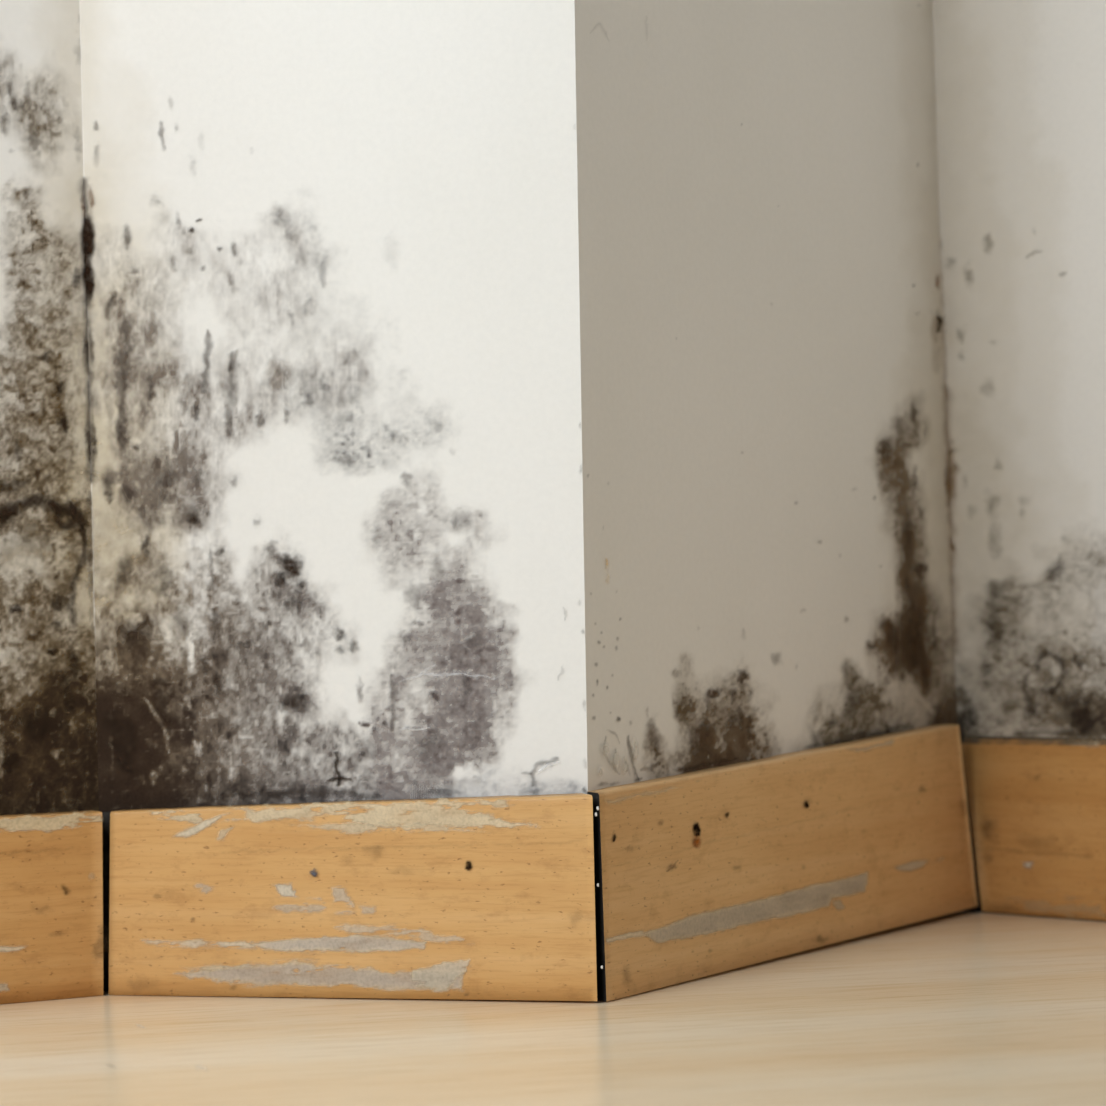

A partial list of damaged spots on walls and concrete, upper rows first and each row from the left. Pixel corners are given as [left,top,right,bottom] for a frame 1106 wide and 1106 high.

damp [9,86,60,137]
damp [0,188,515,815]
damp [868,410,990,746]
damp [982,583,1024,667]
damp [650,673,771,776]
damp [816,667,912,746]
damp [1004,644,1106,745]
peeling [176,815,230,840]
peeling [147,940,254,948]
peeling [276,885,324,911]
peeling [177,960,469,992]
peeling [343,926,462,941]